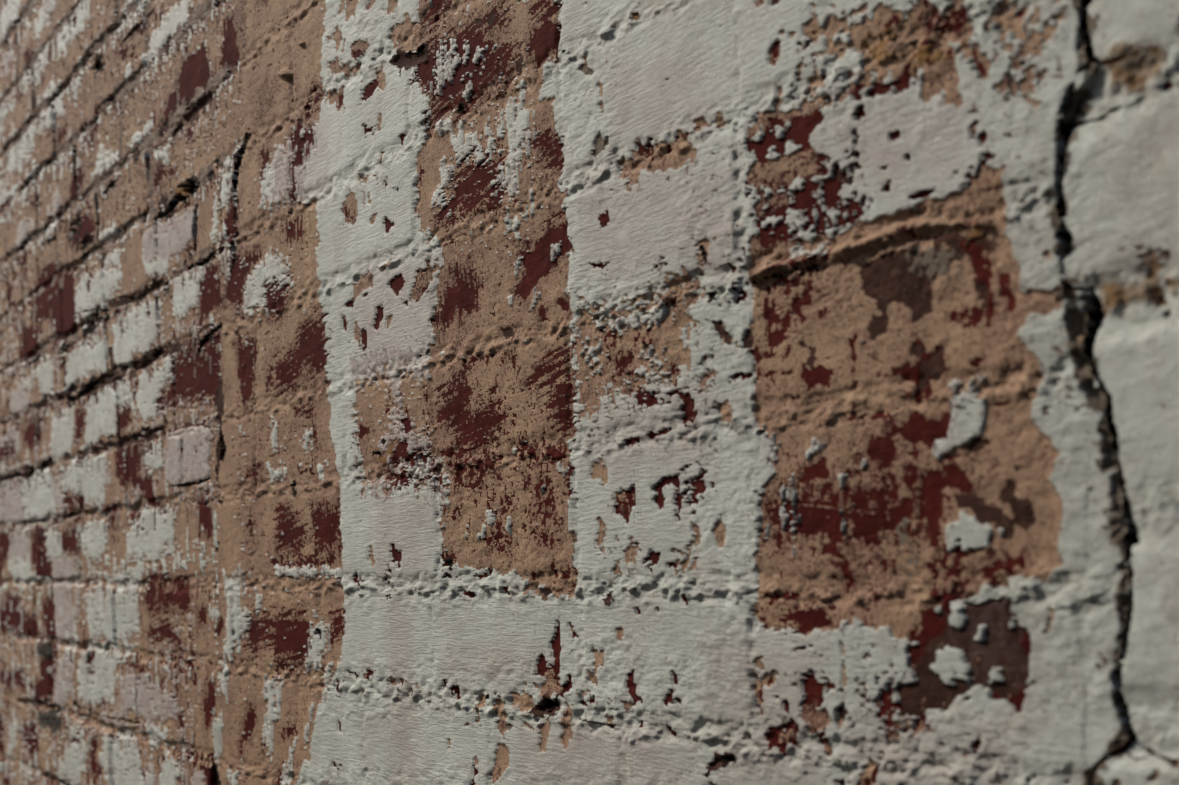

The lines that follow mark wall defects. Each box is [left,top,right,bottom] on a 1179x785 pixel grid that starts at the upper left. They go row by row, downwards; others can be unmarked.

peeling [1123,244,1175,320]
peeling [0,0,376,785]
peeling [341,0,1068,757]
crack [1045,0,1179,785]
peeling [465,621,642,785]
spalling [704,752,737,785]
peeling [834,758,885,785]